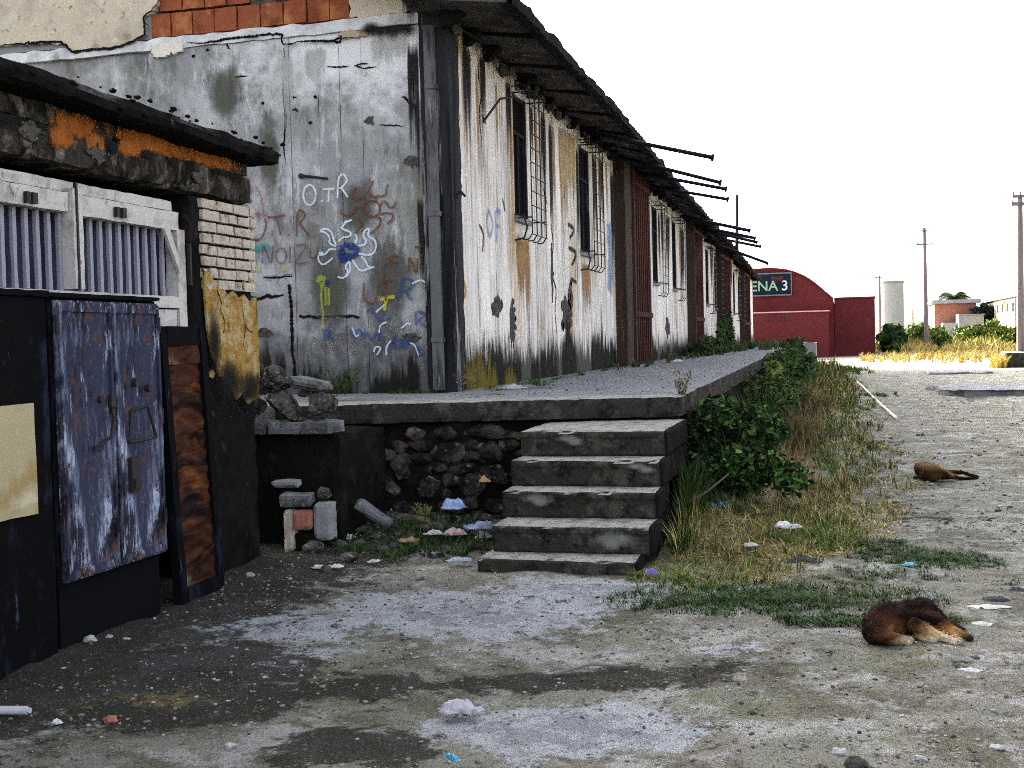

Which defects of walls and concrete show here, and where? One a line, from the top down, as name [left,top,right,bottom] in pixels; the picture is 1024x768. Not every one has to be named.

leakage [212,68,237,115]
rust [50,108,237,172]
leakage [262,118,278,186]
peeling [201,268,273,404]
leakage [465,317,577,389]
leakage [591,308,617,371]